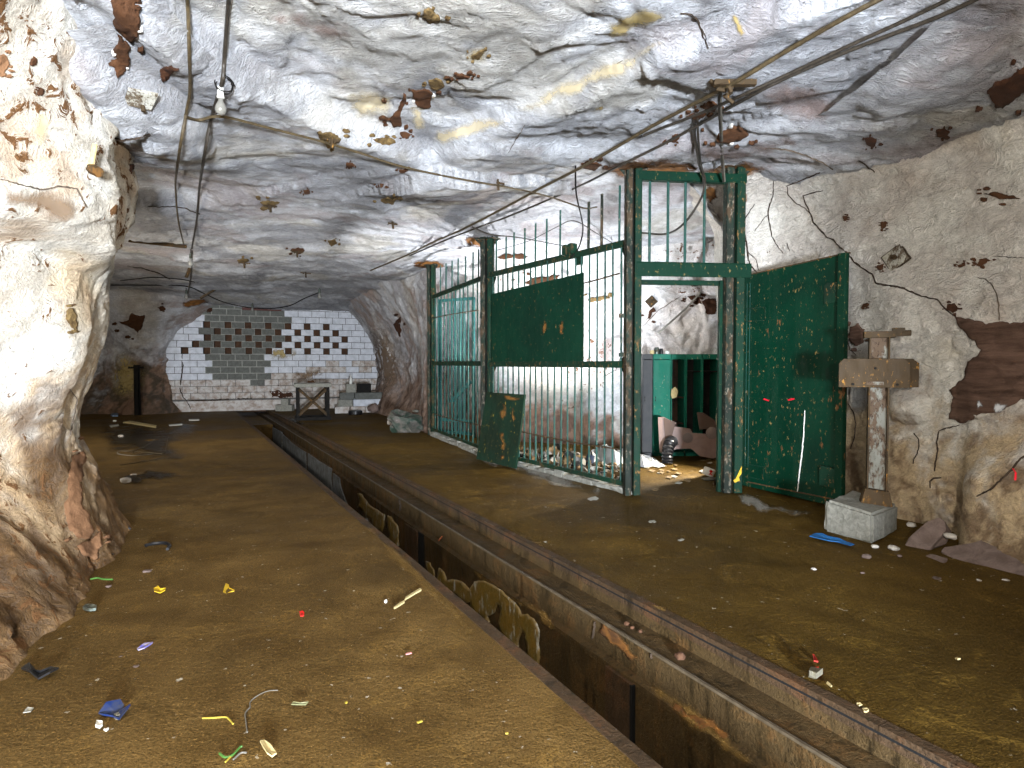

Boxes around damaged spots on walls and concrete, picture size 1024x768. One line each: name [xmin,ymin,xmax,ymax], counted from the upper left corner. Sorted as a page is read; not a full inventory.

peeling [0,50,15,78]
peeling [108,0,144,79]
peeling [367,47,491,147]
peeling [975,59,1024,116]
peeling [256,196,280,211]
peeling [976,187,1020,206]
crack [745,148,956,317]
peeling [112,313,145,340]
crack [977,277,1000,320]
peeling [942,301,1024,424]
crack [912,425,960,488]
crack [976,456,1024,497]